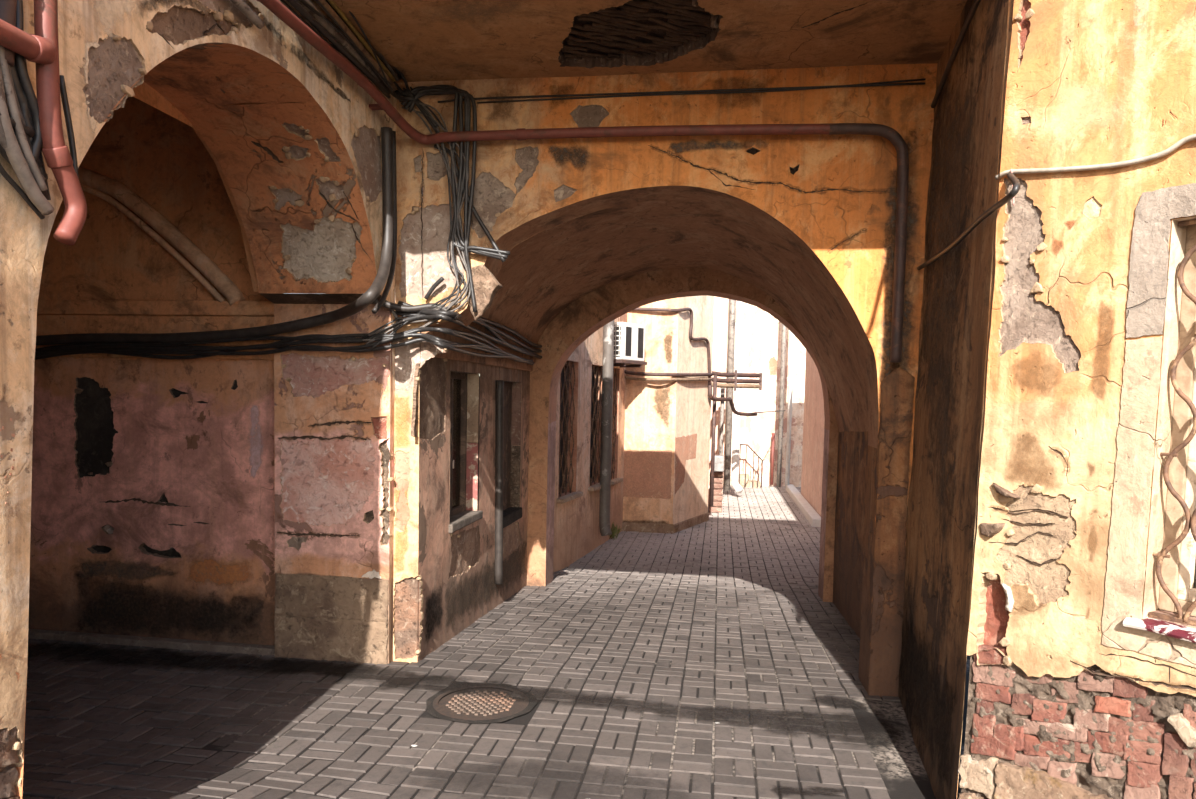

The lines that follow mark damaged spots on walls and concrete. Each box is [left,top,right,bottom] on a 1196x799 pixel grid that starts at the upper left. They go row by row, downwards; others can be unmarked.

spalling [83,0,264,130]
spalling [268,122,382,283]
spalling [554,184,577,202]
crack [648,145,891,193]
spalling [998,178,1081,373]
spalling [74,377,118,478]
crack [277,421,372,440]
crack [105,498,209,526]
crack [277,531,360,539]
leakage [74,561,263,639]
flaking render [958,483,1196,799]
spalling [0,726,24,799]